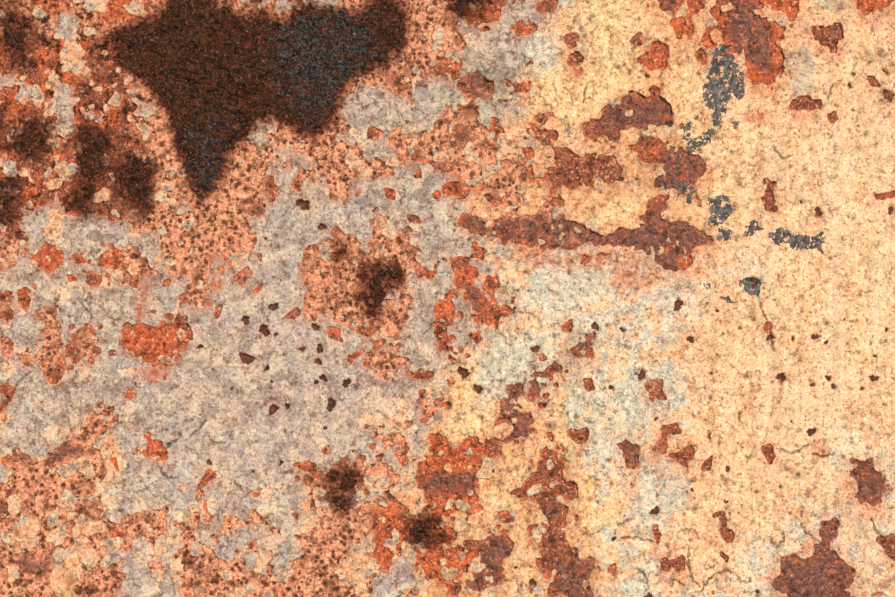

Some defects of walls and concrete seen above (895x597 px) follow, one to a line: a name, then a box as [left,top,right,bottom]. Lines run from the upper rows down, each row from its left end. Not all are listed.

rust [0,3,48,68]
peeling [807,19,849,63]
rust [98,0,421,218]
rust [0,97,170,242]
peeling [0,0,803,385]
rust [323,238,410,332]
rust [506,243,656,300]
peeling [0,204,616,597]
peeling [611,417,732,477]
peeling [845,454,891,514]
rust [388,505,451,561]
peeling [755,514,861,597]